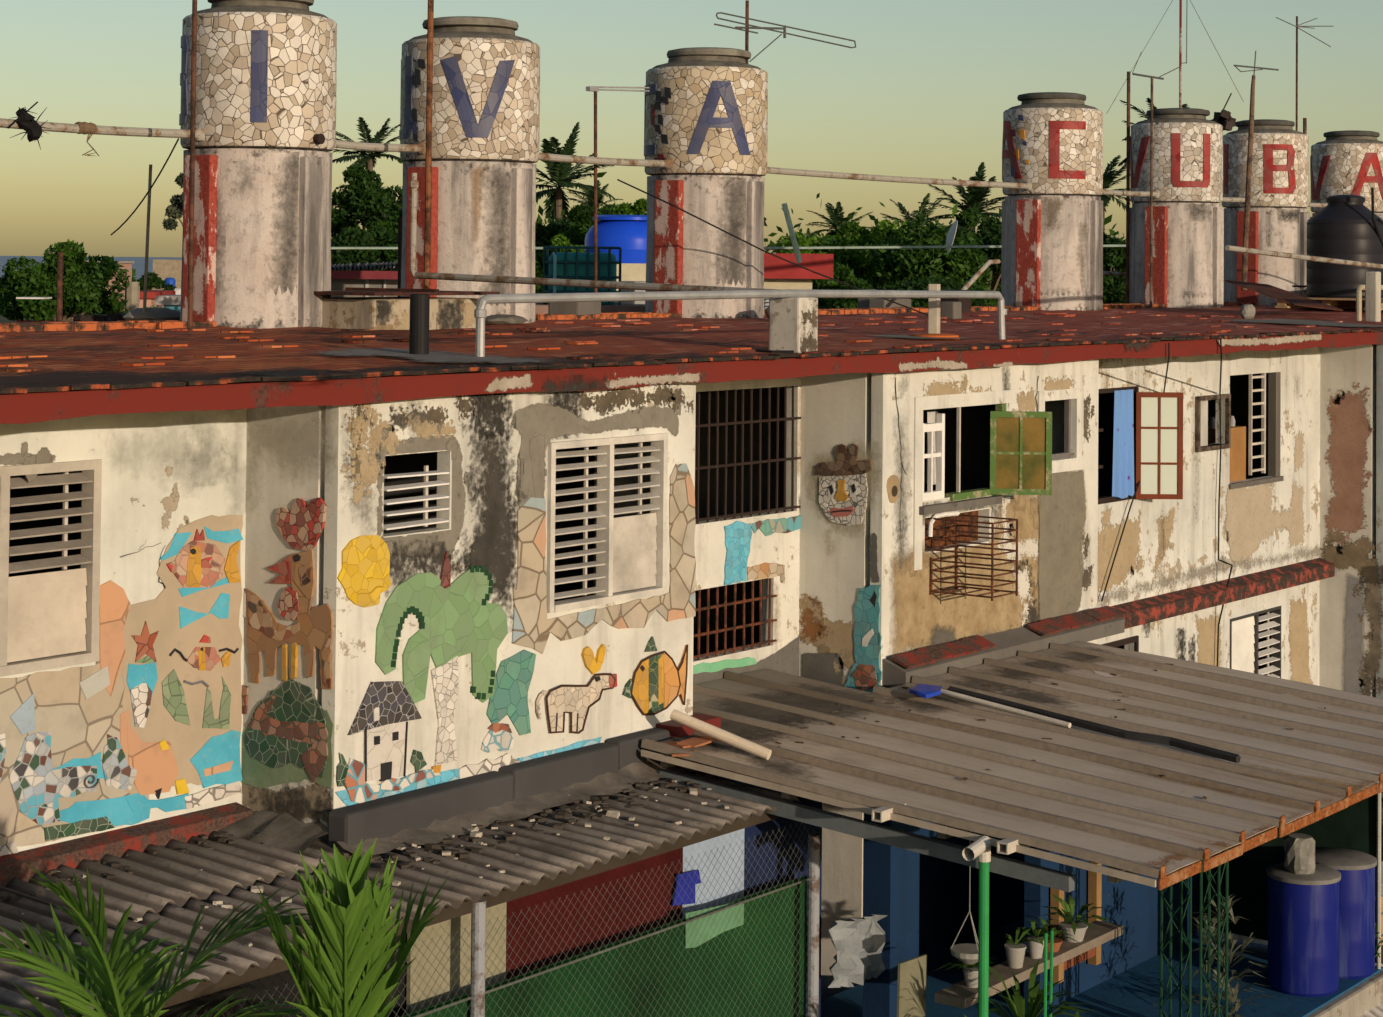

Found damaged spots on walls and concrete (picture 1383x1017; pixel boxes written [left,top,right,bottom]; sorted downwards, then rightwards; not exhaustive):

peeling [189,161,202,224]
peeling [409,188,424,289]
peeling [340,395,479,506]
water stain [229,364,609,415]
peeling [572,373,694,432]
water stain [386,393,547,619]
peeling [870,495,1040,655]
peeling [1082,502,1179,593]
peeling [1220,382,1383,696]
flaking render [799,593,878,691]